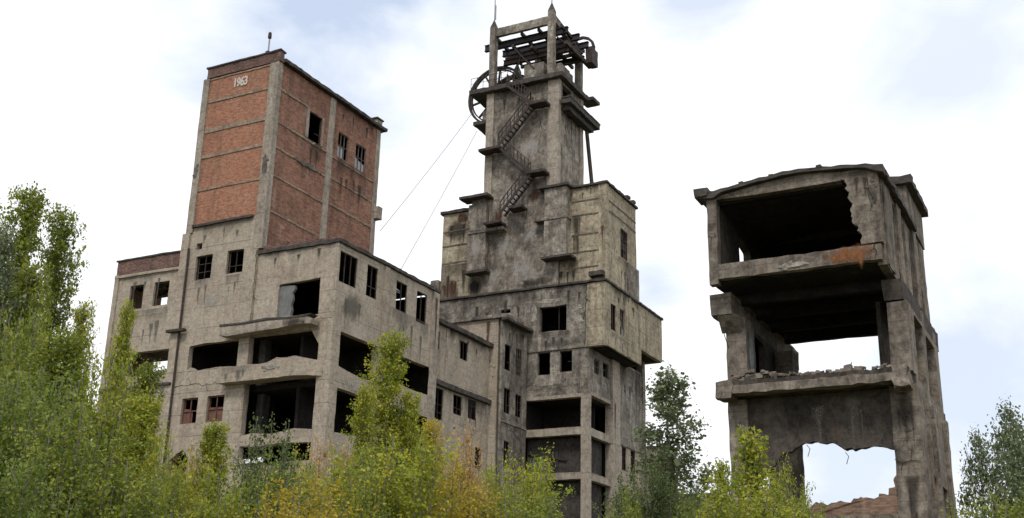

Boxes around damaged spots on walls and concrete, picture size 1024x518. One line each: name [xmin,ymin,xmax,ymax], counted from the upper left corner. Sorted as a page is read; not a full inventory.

corrosion [831,246,867,263]
leakage [447,263,519,317]
leakage [345,299,361,317]